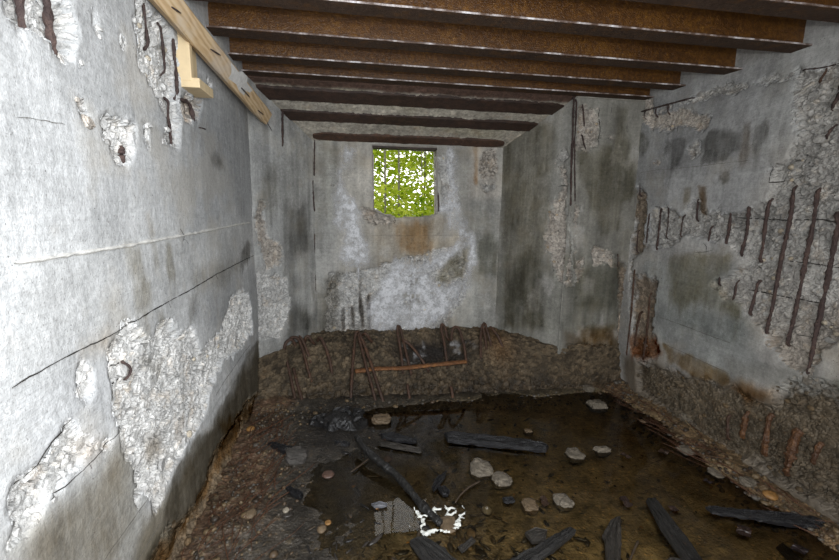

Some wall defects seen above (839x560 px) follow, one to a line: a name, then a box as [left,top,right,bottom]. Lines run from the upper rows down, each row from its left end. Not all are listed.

spalling [3,0,85,69]
spalling [132,0,202,150]
rust [570,97,586,206]
crack [12,255,254,388]
spalling [6,199,292,560]
spalling [323,245,472,332]
water stain [352,149,477,331]
spalling [542,61,839,520]
rust [740,206,751,257]
rust [765,185,798,334]
rust [786,187,822,347]
rust [806,211,839,375]